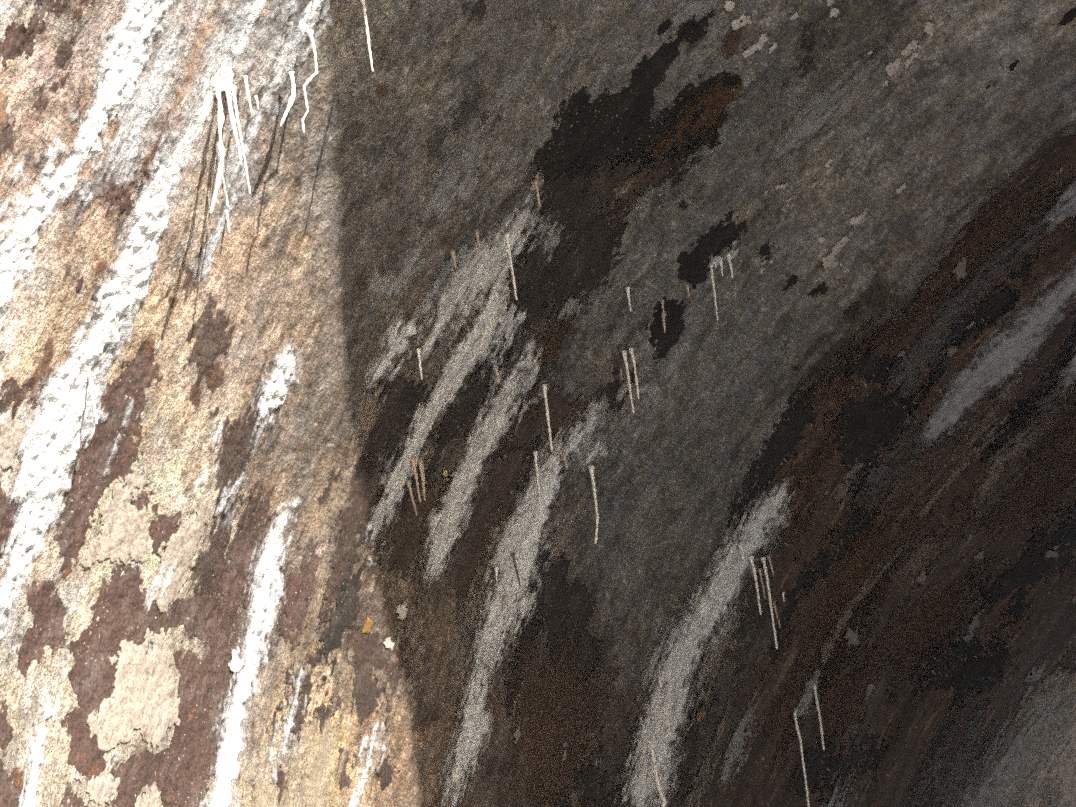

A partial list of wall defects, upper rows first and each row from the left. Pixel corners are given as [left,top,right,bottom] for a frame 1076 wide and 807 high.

damp [0,0,331,680]
damp [61,0,747,807]
damp [779,46,895,161]
damp [627,124,1076,807]
damp [1057,7,1076,26]